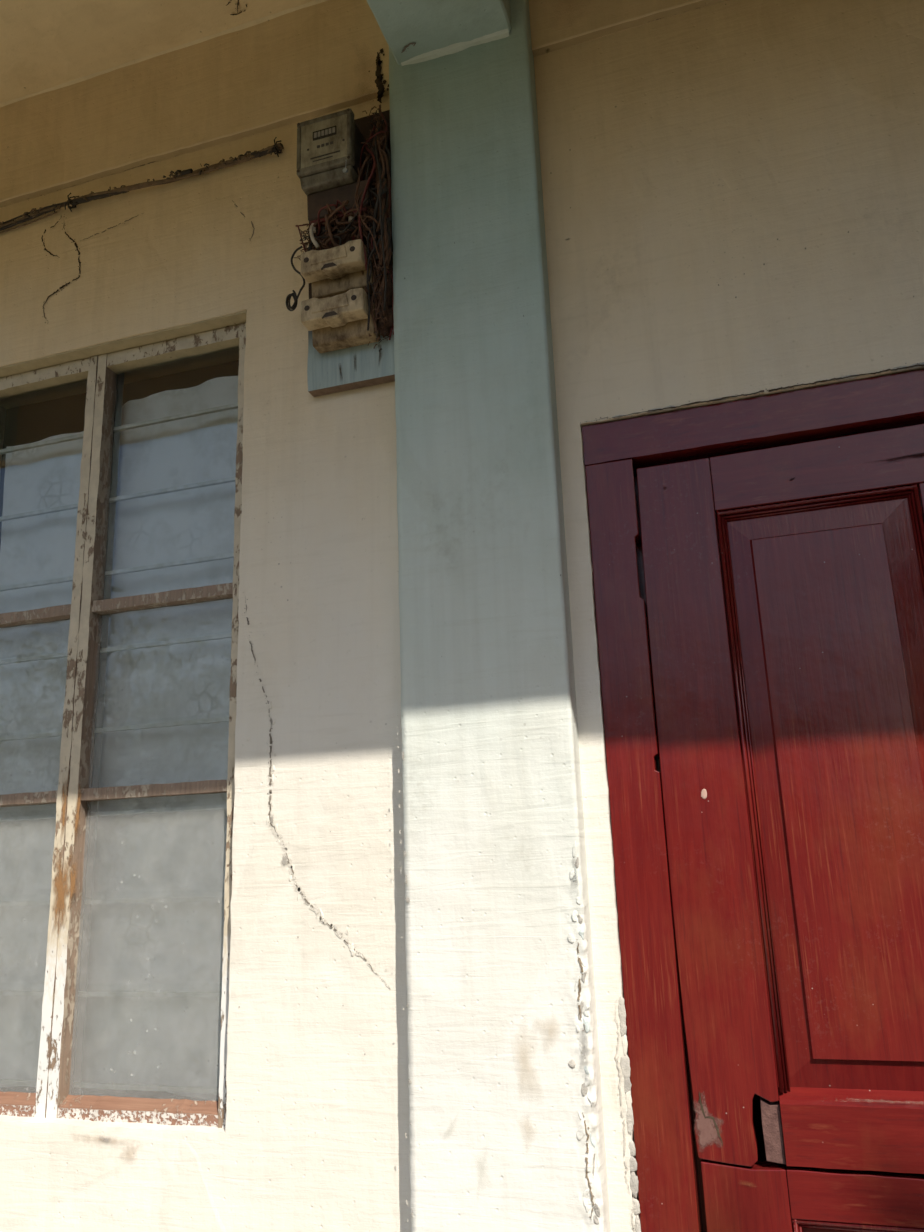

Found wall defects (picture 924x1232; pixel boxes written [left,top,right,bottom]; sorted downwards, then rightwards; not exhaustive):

crack [226,0,247,15]
crack [28,161,155,324]
crack [244,598,410,1025]
spalling [569,841,579,882]
spalling [568,897,600,1224]